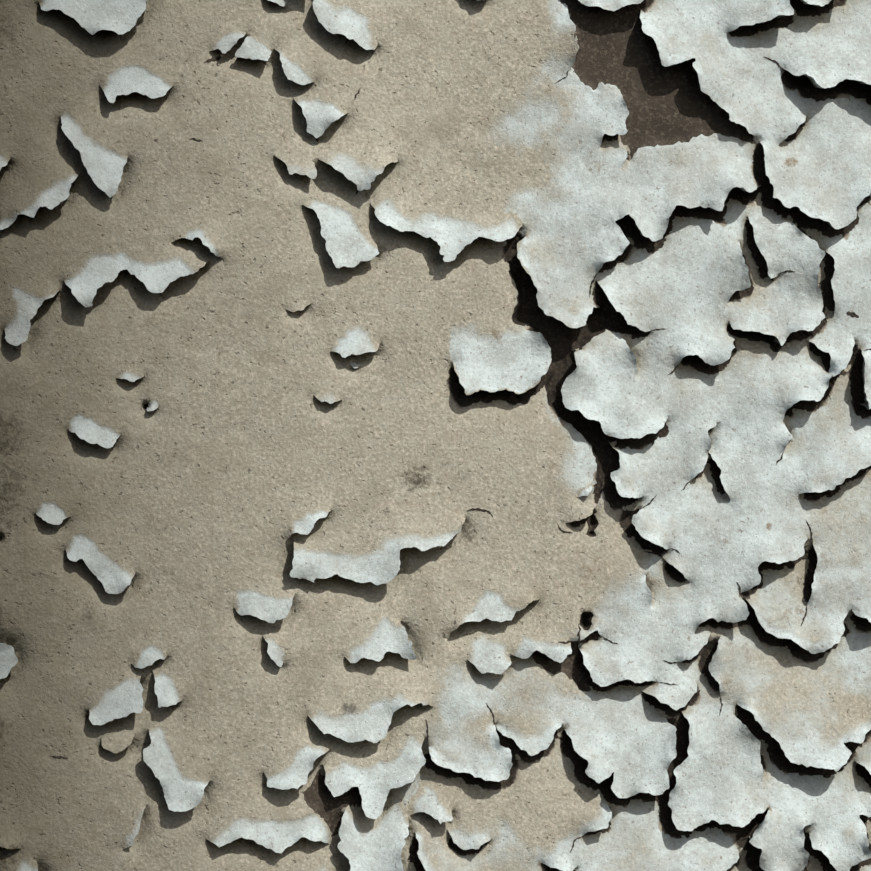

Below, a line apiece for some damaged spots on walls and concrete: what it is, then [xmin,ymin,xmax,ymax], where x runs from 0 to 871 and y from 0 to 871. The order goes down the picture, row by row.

peeling [39,0,147,35]
peeling [99,59,173,103]
peeling [0,107,128,230]
peeling [1,222,222,346]
peeling [206,0,871,871]
peeling [35,499,71,525]
peeling [65,528,136,594]
peeling [0,643,18,679]
peeling [89,640,183,753]
peeling [143,722,210,812]
peeling [0,836,38,871]
peeling [122,803,146,850]